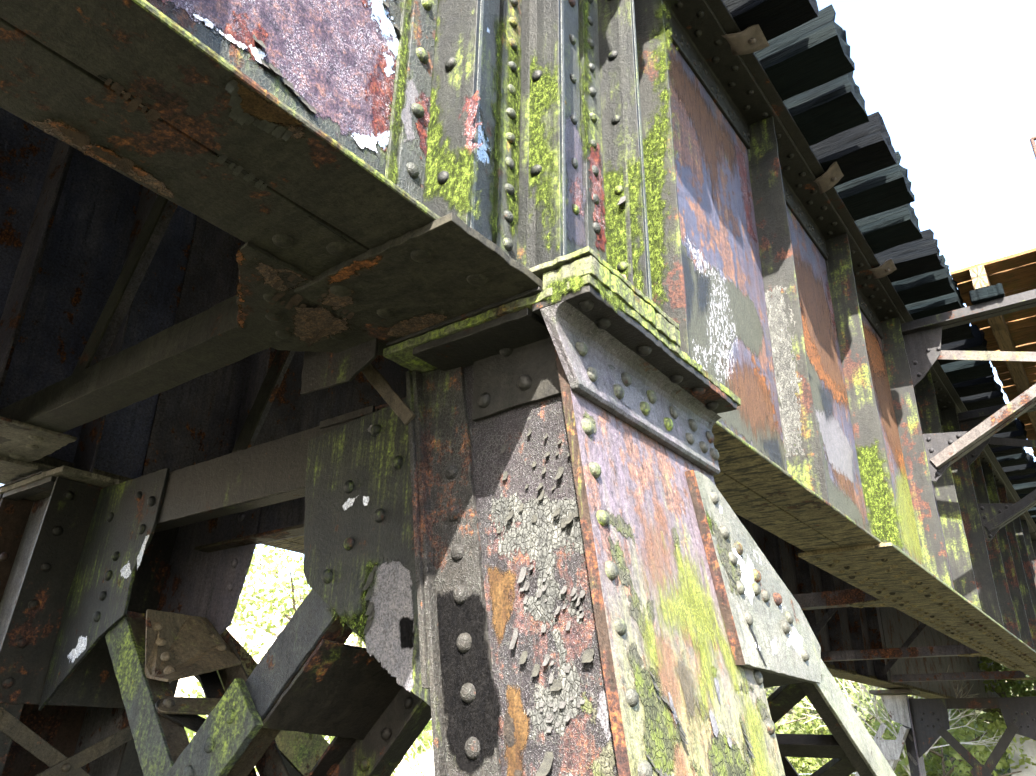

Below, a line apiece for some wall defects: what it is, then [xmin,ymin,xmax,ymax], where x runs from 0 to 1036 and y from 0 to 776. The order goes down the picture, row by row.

peeling [193,14,317,114]
peeling [365,0,401,77]
peeling [349,128,390,151]
peeling [477,97,491,164]
corrosion [667,57,757,243]
corrosion [236,249,383,347]
corrosion [719,355,782,442]
peeling [329,560,414,692]
corrosion [488,567,516,644]
peeling [490,433,618,776]
corrosion [503,685,529,776]
water stain [676,658,710,723]